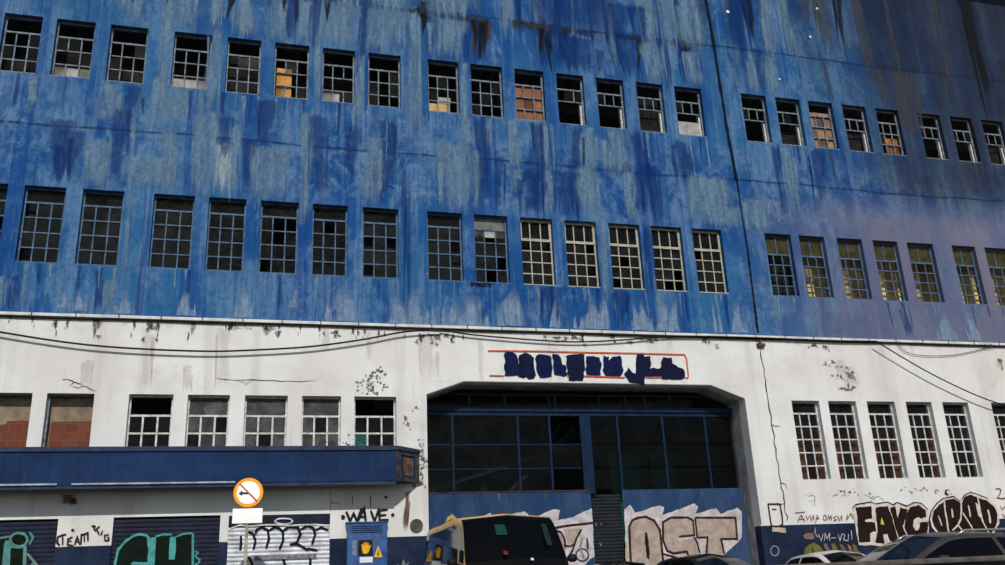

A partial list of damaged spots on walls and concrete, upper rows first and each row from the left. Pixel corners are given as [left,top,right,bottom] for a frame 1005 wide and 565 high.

damp [218,0,251,31]
damp [270,0,339,43]
damp [206,38,222,104]
damp [356,0,489,145]
damp [191,95,285,196]
peeling [177,295,196,316]
peeling [355,366,388,395]
crack [745,256,788,521]